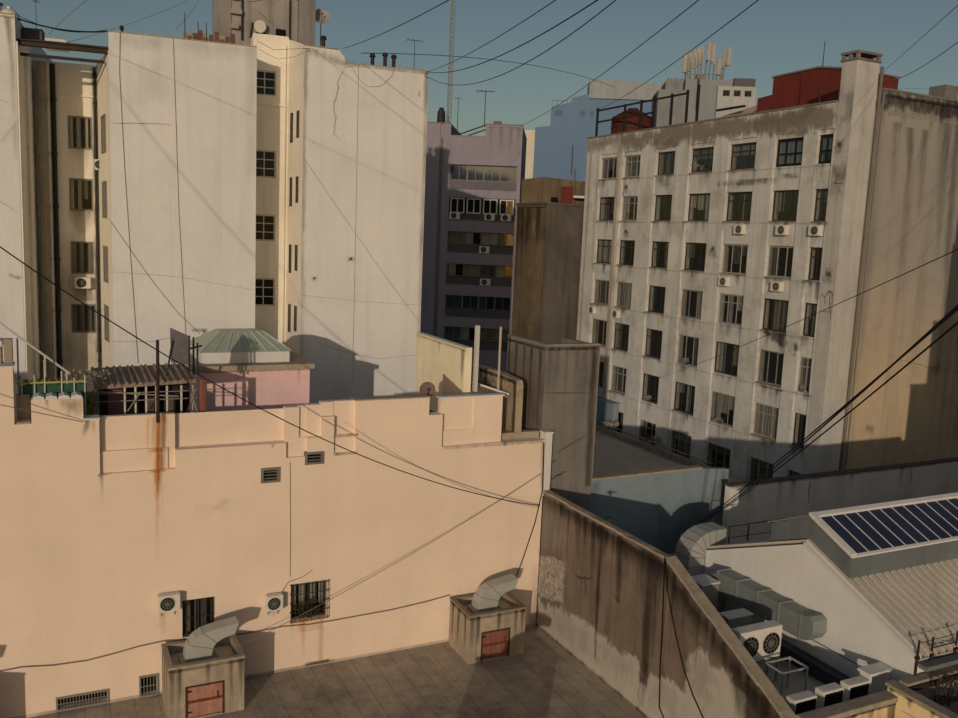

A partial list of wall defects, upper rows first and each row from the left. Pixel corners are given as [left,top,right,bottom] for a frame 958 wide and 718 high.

water stain [881,91,958,150]
peeling [537,555,747,718]
water stain [560,504,777,718]